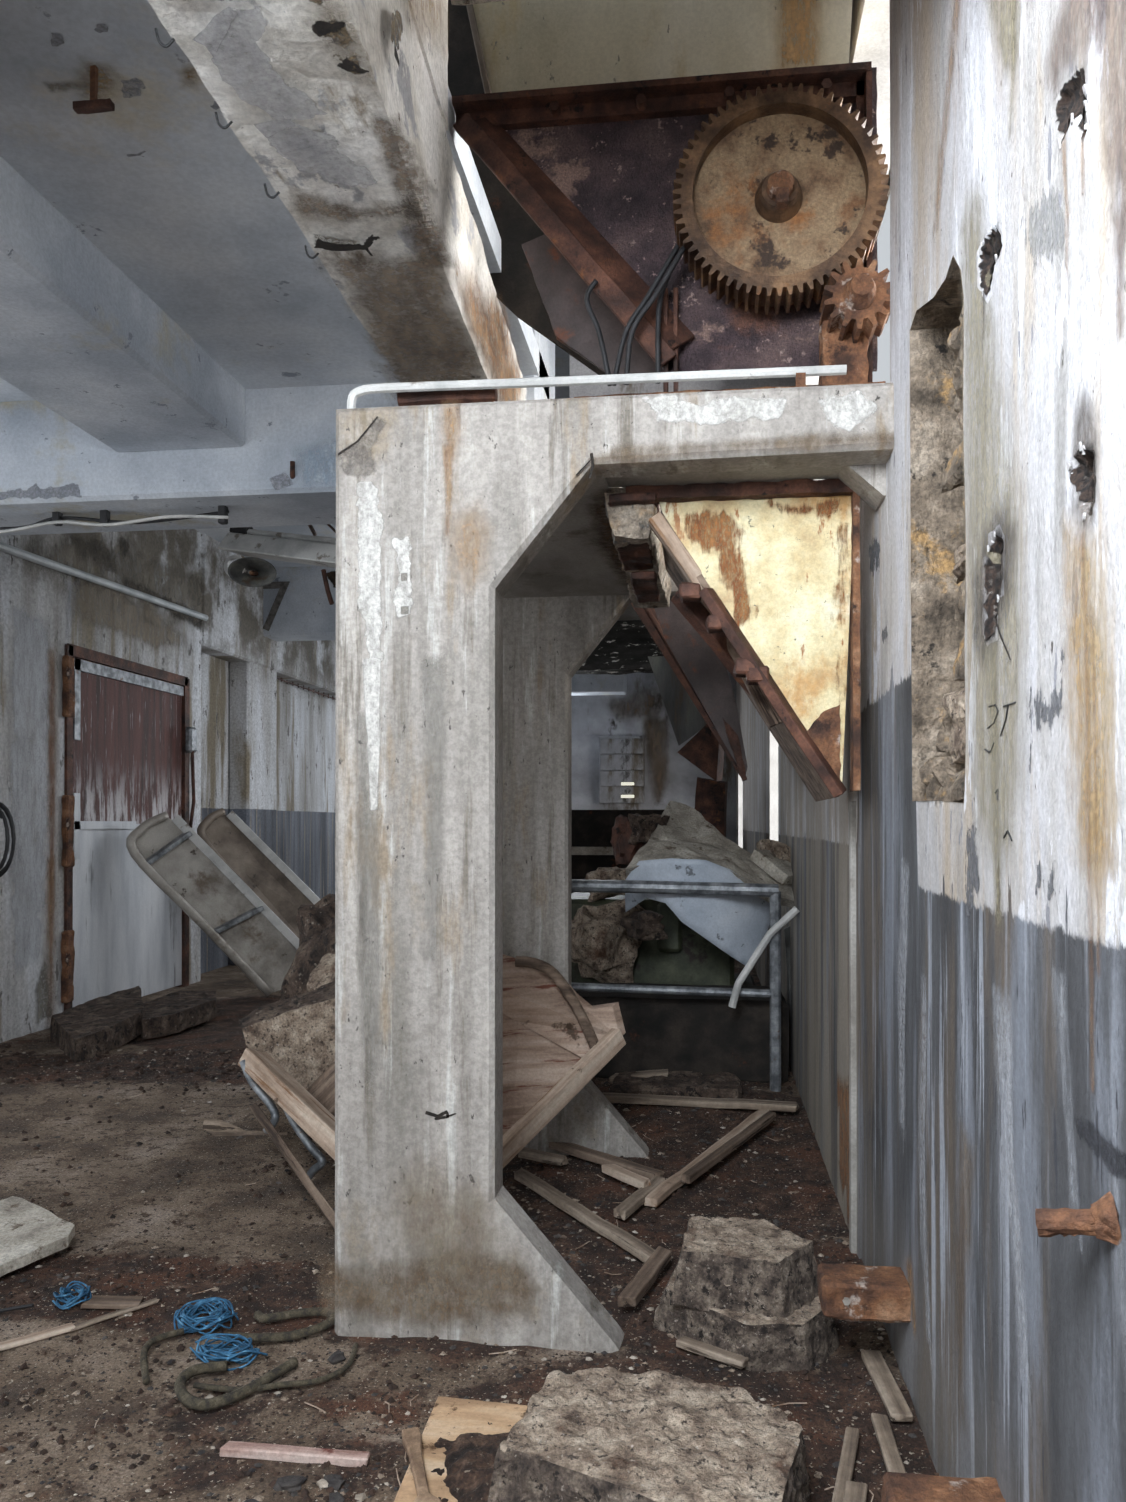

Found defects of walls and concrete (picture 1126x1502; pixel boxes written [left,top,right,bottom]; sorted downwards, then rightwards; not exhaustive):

water stain [991,0,1016,72]
spalling [1056,68,1088,149]
water stain [1050,0,1126,329]
water stain [295,117,481,396]
spalling [978,227,1002,314]
spalling [1066,400,1096,525]
rust [685,510,758,627]
rust [768,498,848,620]
spalling [976,519,1011,660]
rust [807,661,847,780]
rust [1069,548,1108,869]